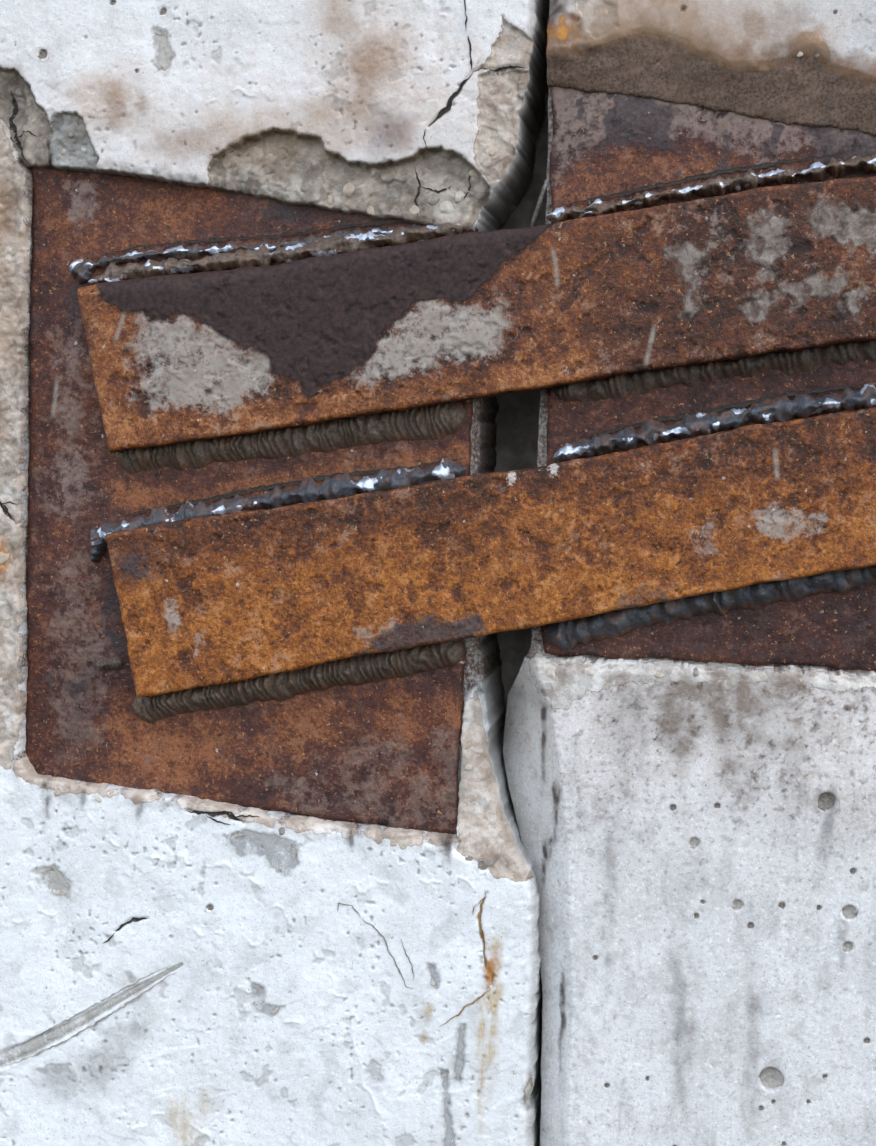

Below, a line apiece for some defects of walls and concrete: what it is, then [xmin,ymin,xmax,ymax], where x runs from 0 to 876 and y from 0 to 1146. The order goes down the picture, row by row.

spalling [208,16,533,231]
crack [414,0,524,218]
crack [0,501,17,526]
spalling [0,67,534,882]
crack [102,917,147,944]
crack [337,902,414,989]
crack [441,892,493,1026]
rust [479,942,500,1084]